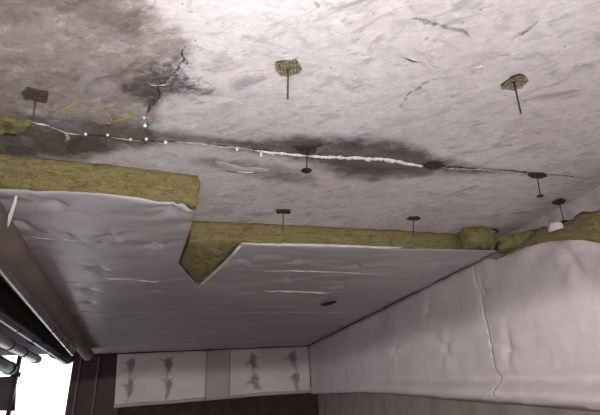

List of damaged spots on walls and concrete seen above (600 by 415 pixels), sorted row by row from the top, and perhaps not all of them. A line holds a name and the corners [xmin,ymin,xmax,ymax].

water stain [0,0,222,159]
crack [33,34,425,168]
water stain [231,137,487,181]
crack [441,166,579,178]